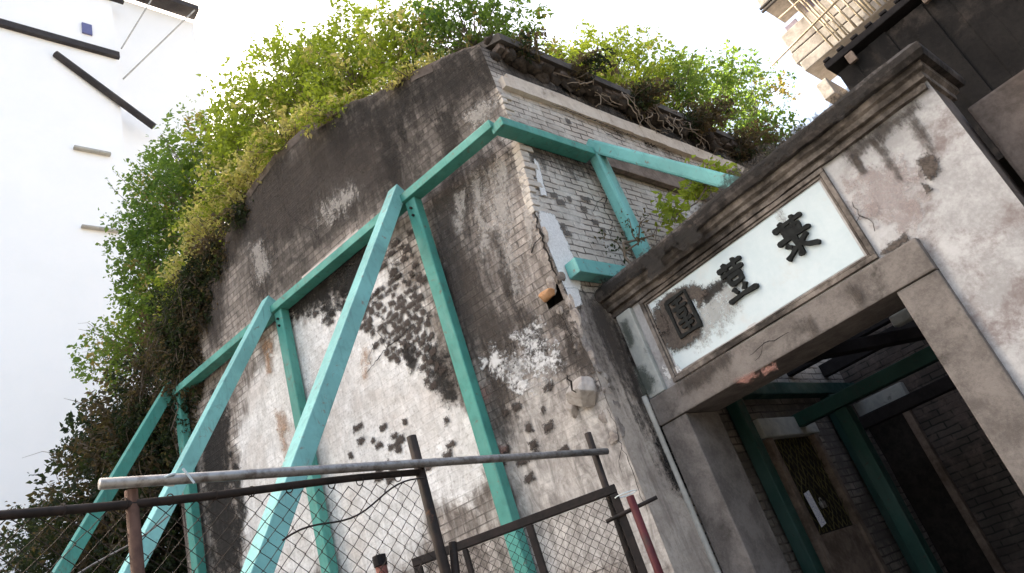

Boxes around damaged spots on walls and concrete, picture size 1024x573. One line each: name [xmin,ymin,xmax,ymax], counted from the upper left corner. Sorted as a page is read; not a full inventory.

spalling [500,406,554,484]
spalling [453,157,625,445]
leakage [208,47,894,495]
leakage [847,100,932,180]